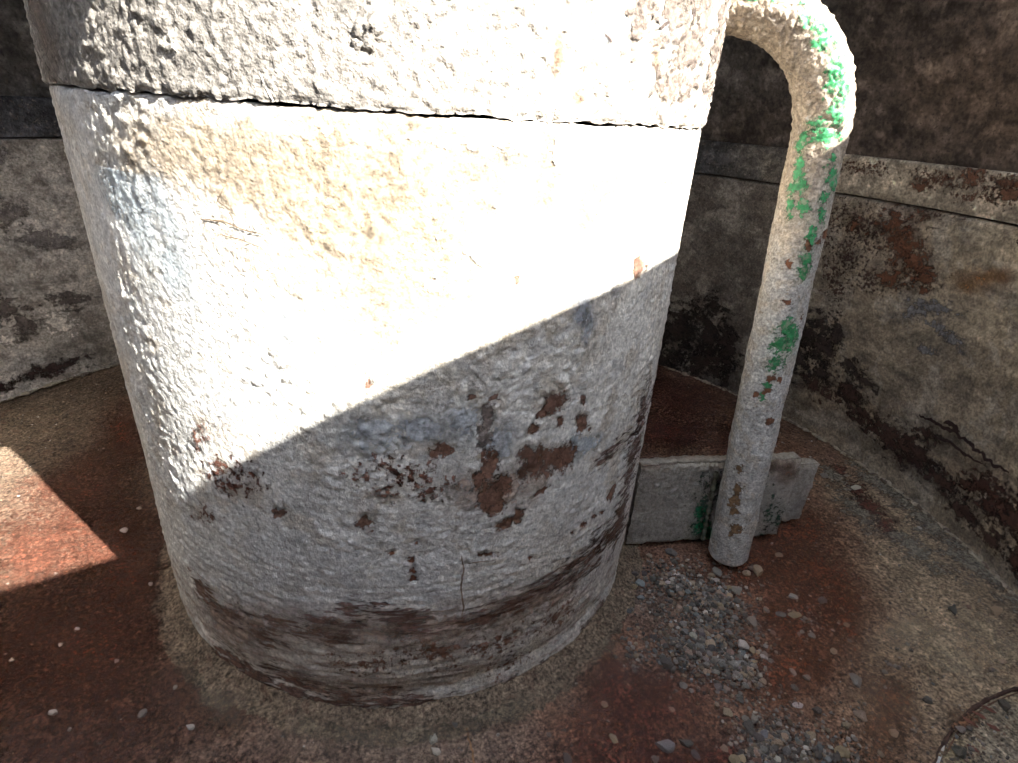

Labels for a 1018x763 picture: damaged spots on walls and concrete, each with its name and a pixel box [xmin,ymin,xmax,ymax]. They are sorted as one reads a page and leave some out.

crack [650,2,695,33]
rust [0,388,628,730]
rust [545,654,752,763]